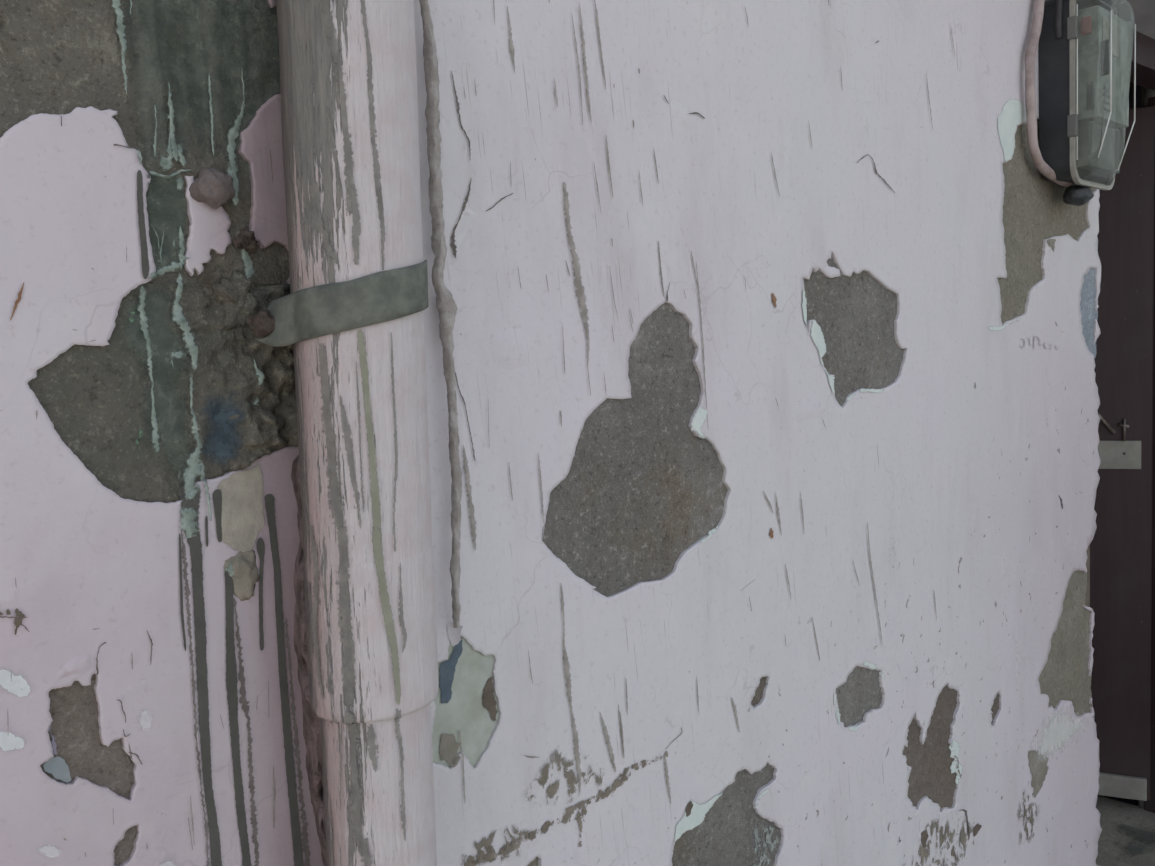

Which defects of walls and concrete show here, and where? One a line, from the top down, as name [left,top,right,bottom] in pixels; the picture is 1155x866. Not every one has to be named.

flaking render [0,0,299,503]
flaking render [802,255,905,406]
flaking render [989,99,1095,331]
flaking render [1080,268,1098,358]
flaking render [542,303,728,597]
flaking render [40,674,135,799]
flaking render [432,622,499,768]
spalling [463,751,668,866]
flaking render [672,764,781,866]
flaking render [834,660,885,731]
flaking render [902,685,982,866]
flaking render [1039,570,1093,717]